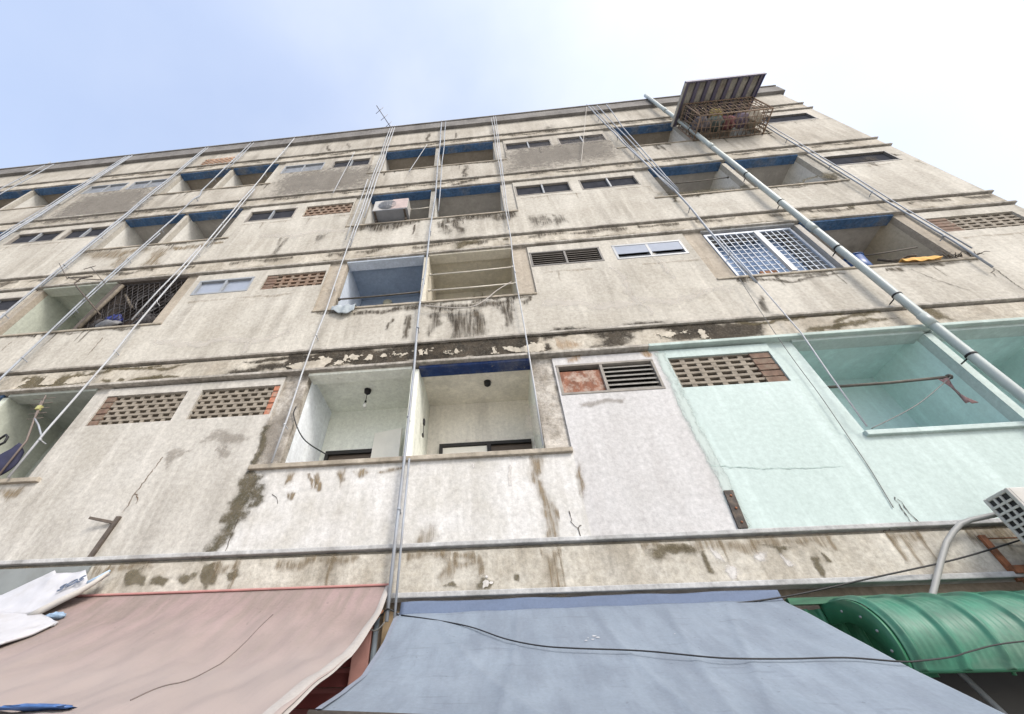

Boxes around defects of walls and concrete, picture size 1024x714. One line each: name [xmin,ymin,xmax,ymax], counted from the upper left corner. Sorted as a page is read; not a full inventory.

leakage [158,296,572,374]
peeling [286,348,462,369]
peeling [491,342,546,354]
peeling [656,329,711,340]
leakage [206,415,286,552]
leakage [531,459,560,537]
leakage [436,551,484,574]
leakage [541,551,562,596]
leakage [645,539,779,573]
leakage [887,533,933,561]